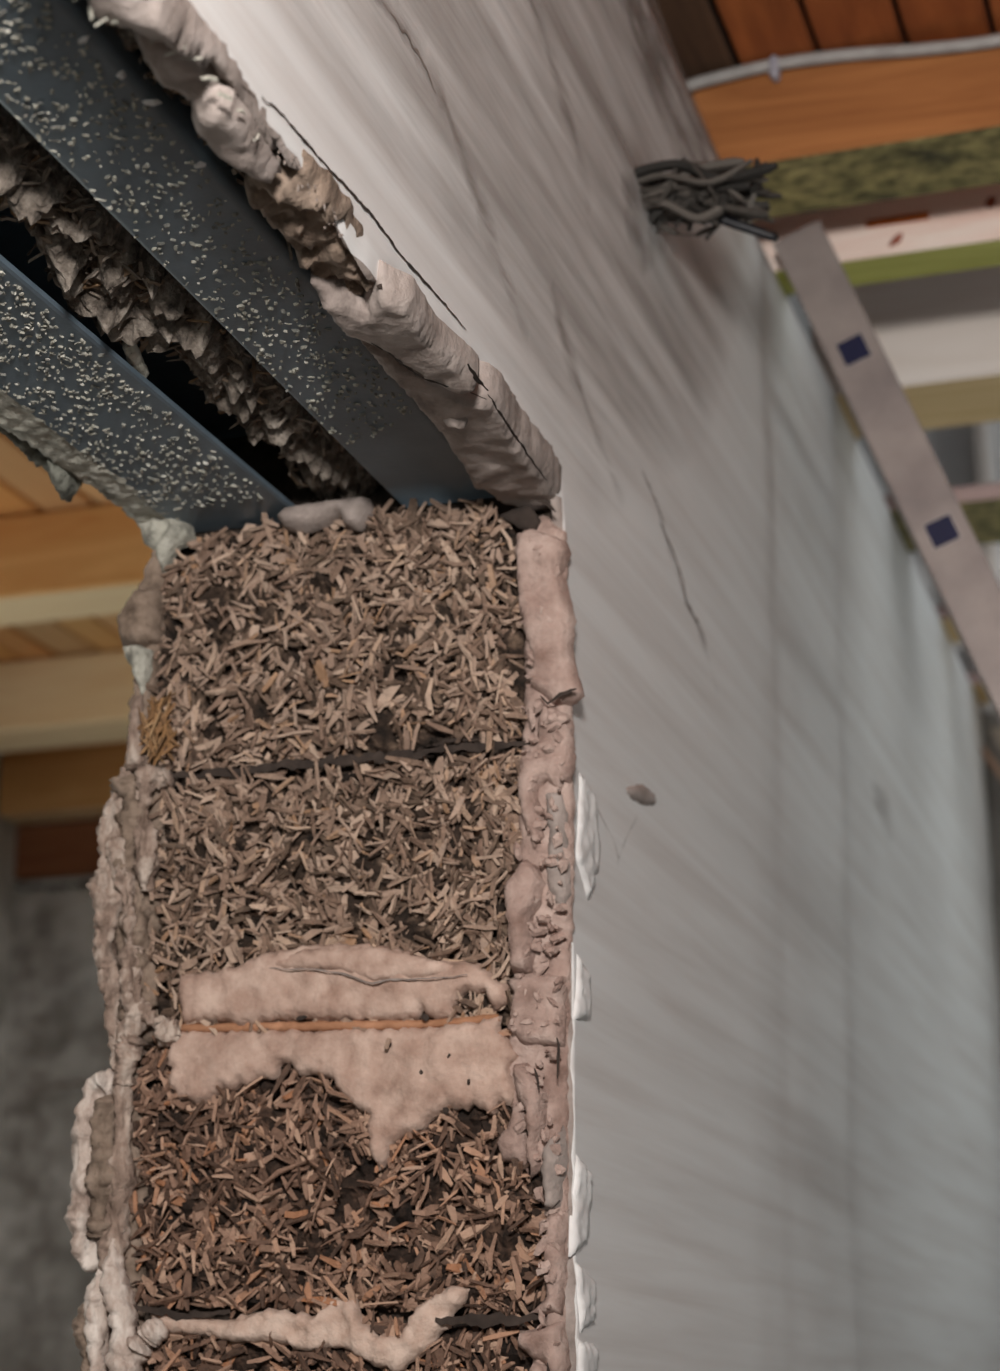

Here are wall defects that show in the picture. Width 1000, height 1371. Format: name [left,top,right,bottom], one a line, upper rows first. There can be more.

flaking render [72,0,479,394]
crack [643,472,707,646]